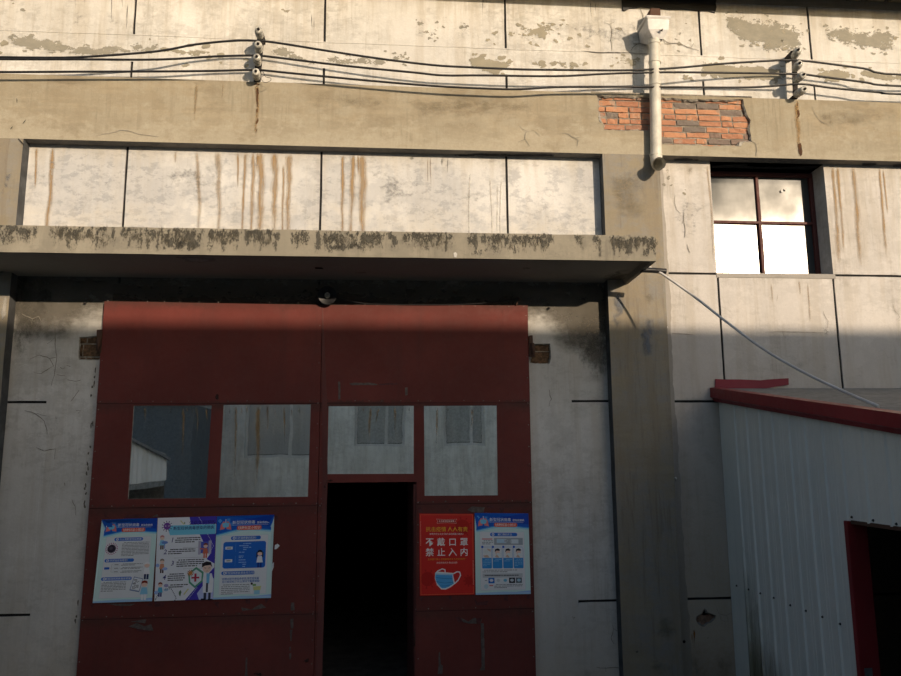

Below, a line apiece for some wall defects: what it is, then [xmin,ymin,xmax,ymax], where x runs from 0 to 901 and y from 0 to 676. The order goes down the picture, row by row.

peeling [0,34,225,67]
peeling [683,56,785,83]
peeling [726,11,809,53]
spalling [591,91,650,131]
spalling [661,94,752,146]
rust [237,154,292,230]
rust [341,157,366,231]
rust [832,170,844,253]
rust [853,172,861,251]
damp [0,225,37,244]
damp [50,225,280,262]
damp [291,230,453,252]